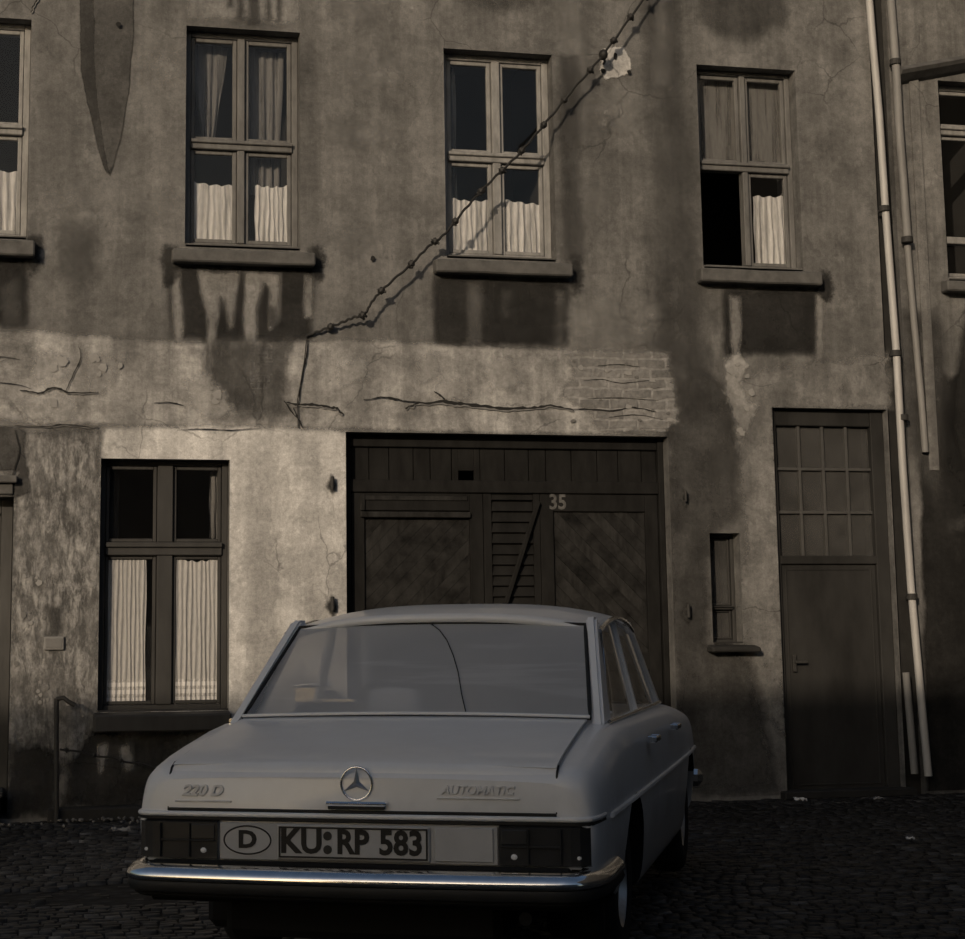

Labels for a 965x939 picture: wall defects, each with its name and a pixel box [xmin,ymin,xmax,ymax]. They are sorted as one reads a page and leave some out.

leakage [187,0,299,24]
leakage [80,0,134,175]
leakage [0,258,27,327]
crack [0,346,99,395]
leakage [171,265,313,416]
crack [284,339,344,428]
leakage [433,276,569,345]
crack [364,391,656,412]
flaking render [562,350,679,432]
flaking render [724,352,758,443]
leakage [724,288,825,360]
leakage [908,315,965,791]